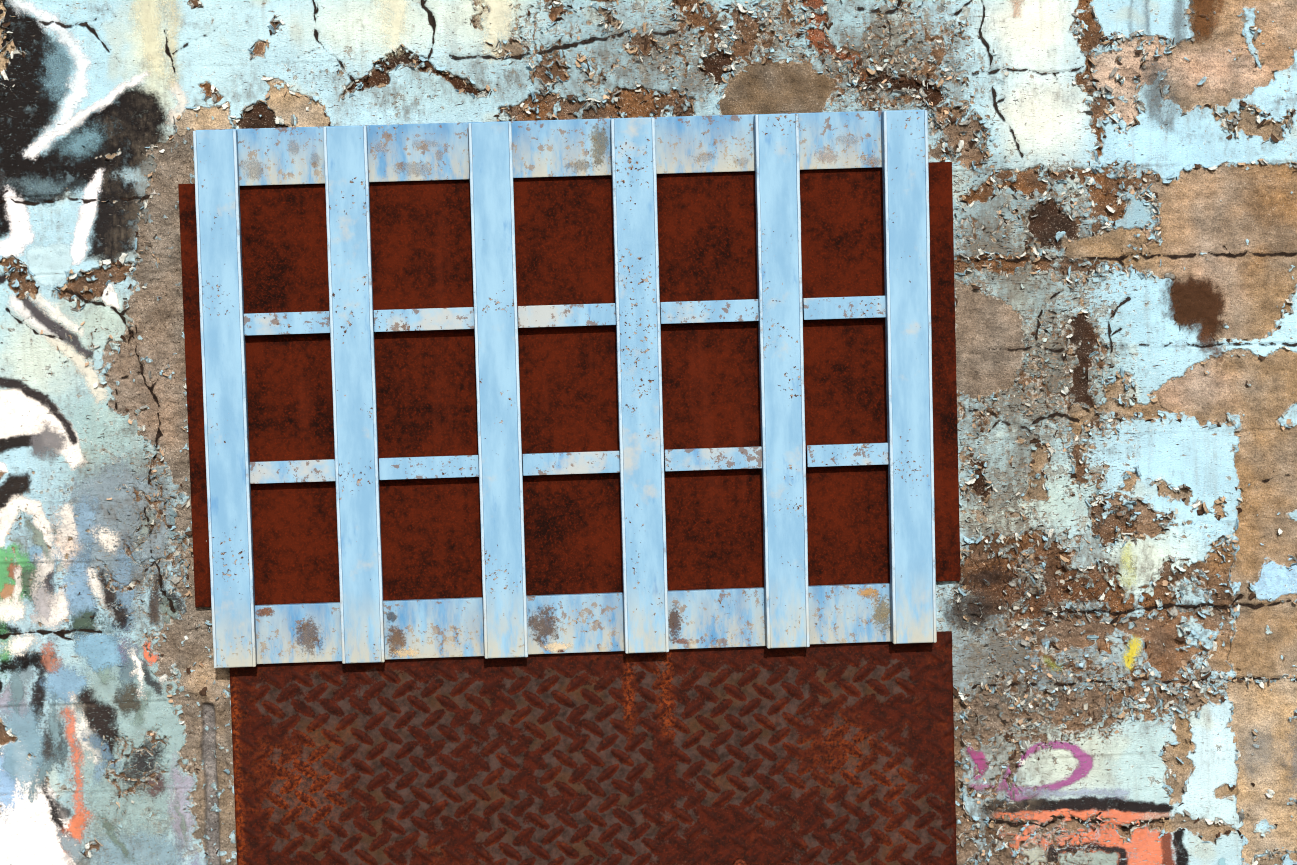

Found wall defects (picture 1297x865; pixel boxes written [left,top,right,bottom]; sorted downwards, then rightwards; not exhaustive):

peeling [0,0,28,89]
peeling [247,13,285,60]
crack [298,0,355,83]
crack [840,0,902,38]
crack [951,0,1084,157]
peeling [0,74,333,407]
peeling [320,0,1297,865]
peeling [64,394,232,835]
corrosion [296,620,320,652]
corrosion [386,612,418,658]
corrosion [528,607,570,652]
corrosion [668,609,688,644]